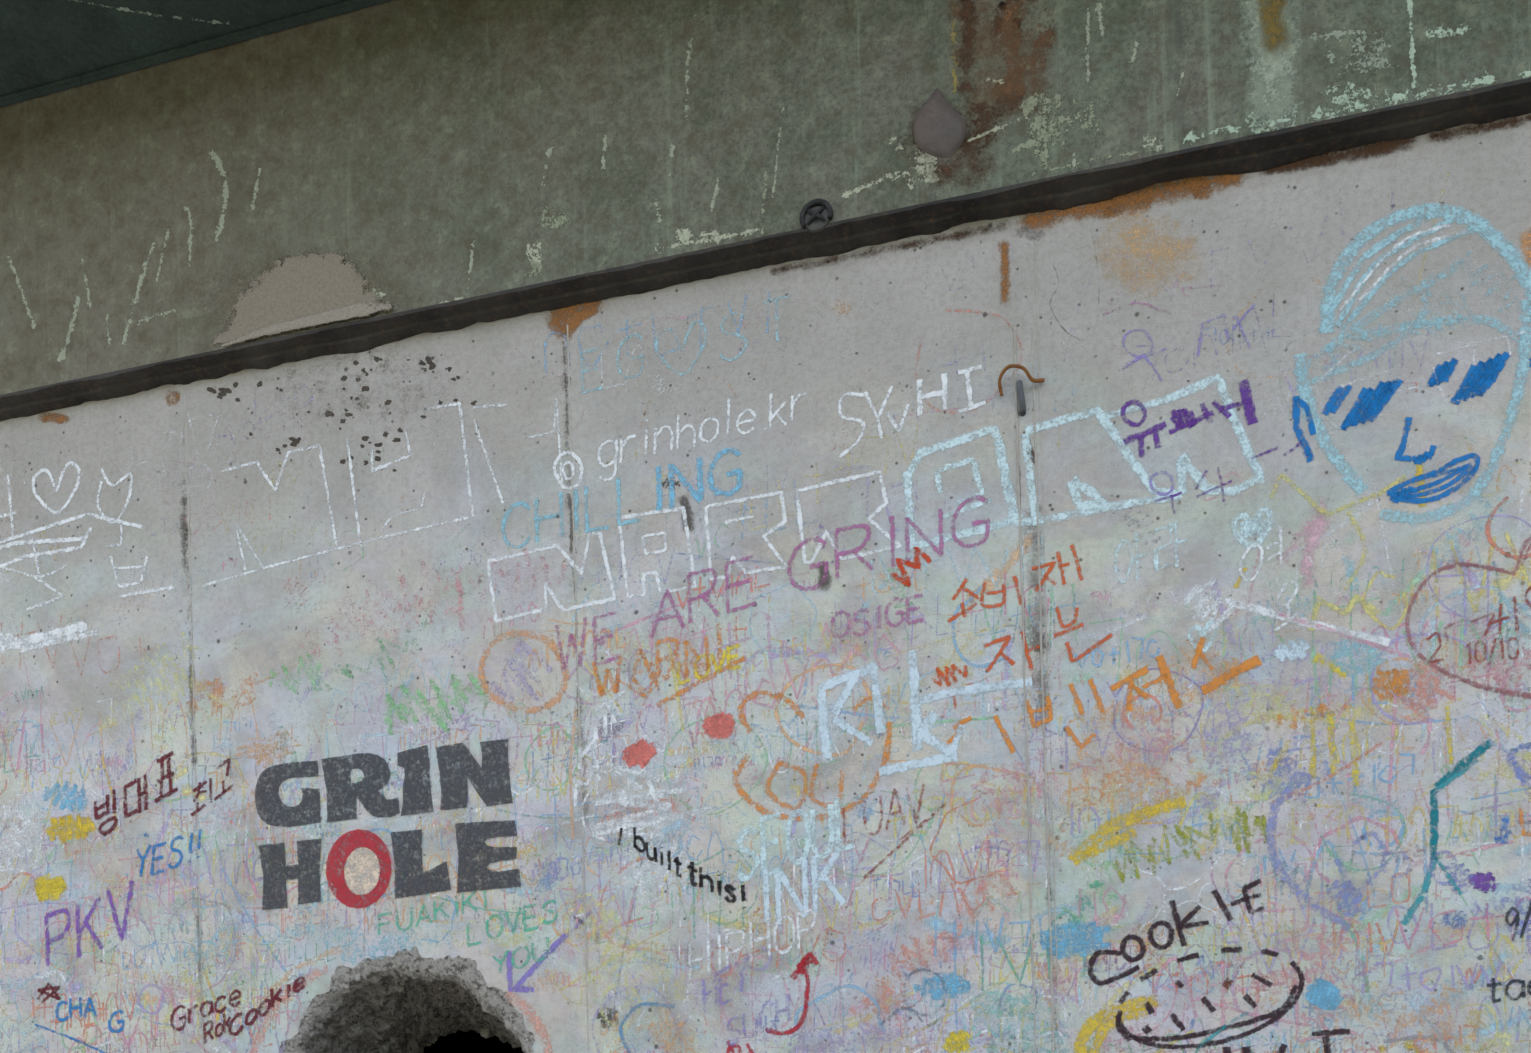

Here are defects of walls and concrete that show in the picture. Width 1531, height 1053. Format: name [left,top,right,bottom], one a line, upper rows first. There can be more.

rust [949,0,1051,148]
rust [1263,115,1531,175]
rust [771,174,1243,301]